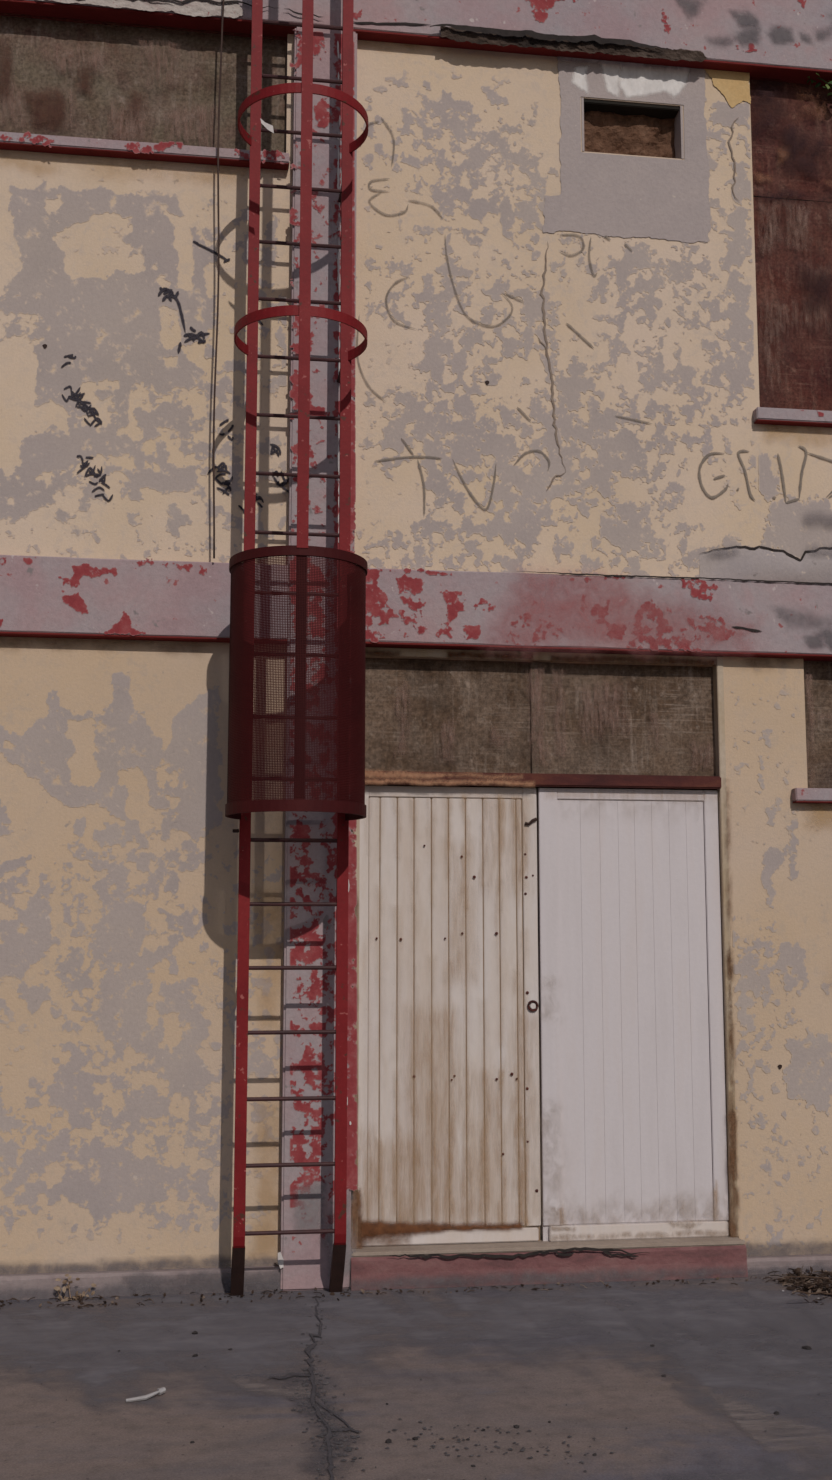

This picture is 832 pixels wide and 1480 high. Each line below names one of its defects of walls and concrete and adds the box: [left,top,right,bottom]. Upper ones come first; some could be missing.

spalling [42,0,244,18]
spalling [440,0,707,62]
peeling [0,29,832,802]
crack [526,546,832,585]
crack [732,625,761,633]
peeling [0,672,358,1269]
peeling [730,683,832,1249]
corrosion [351,1190,528,1249]